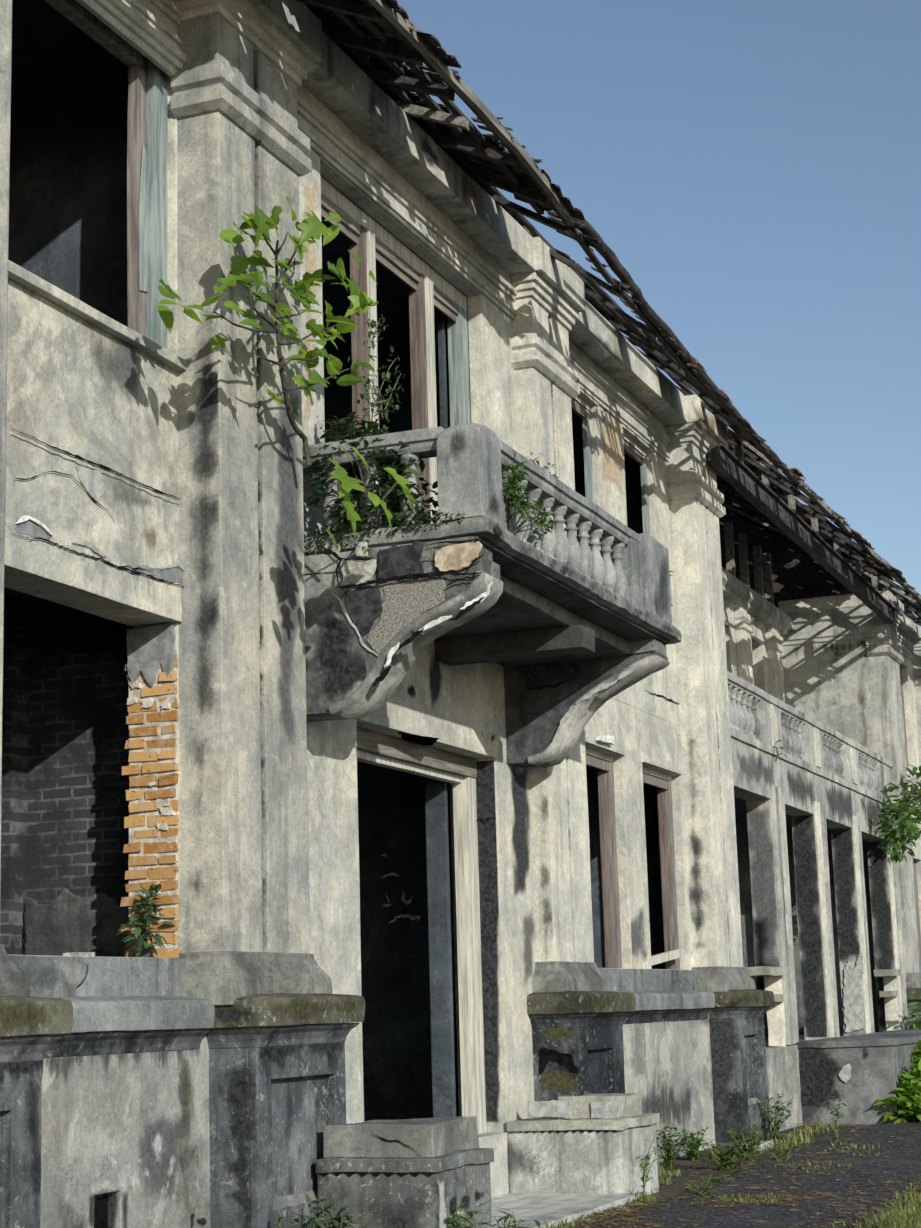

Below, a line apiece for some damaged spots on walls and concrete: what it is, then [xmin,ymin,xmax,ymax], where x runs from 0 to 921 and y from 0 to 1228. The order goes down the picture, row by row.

crack [10,428,180,523]
damp [190,346,218,579]
crack [11,515,184,587]
damp [198,598,216,707]
spalling [322,541,493,686]
damp [689,834,703,930]
crack [372,1133,421,1156]